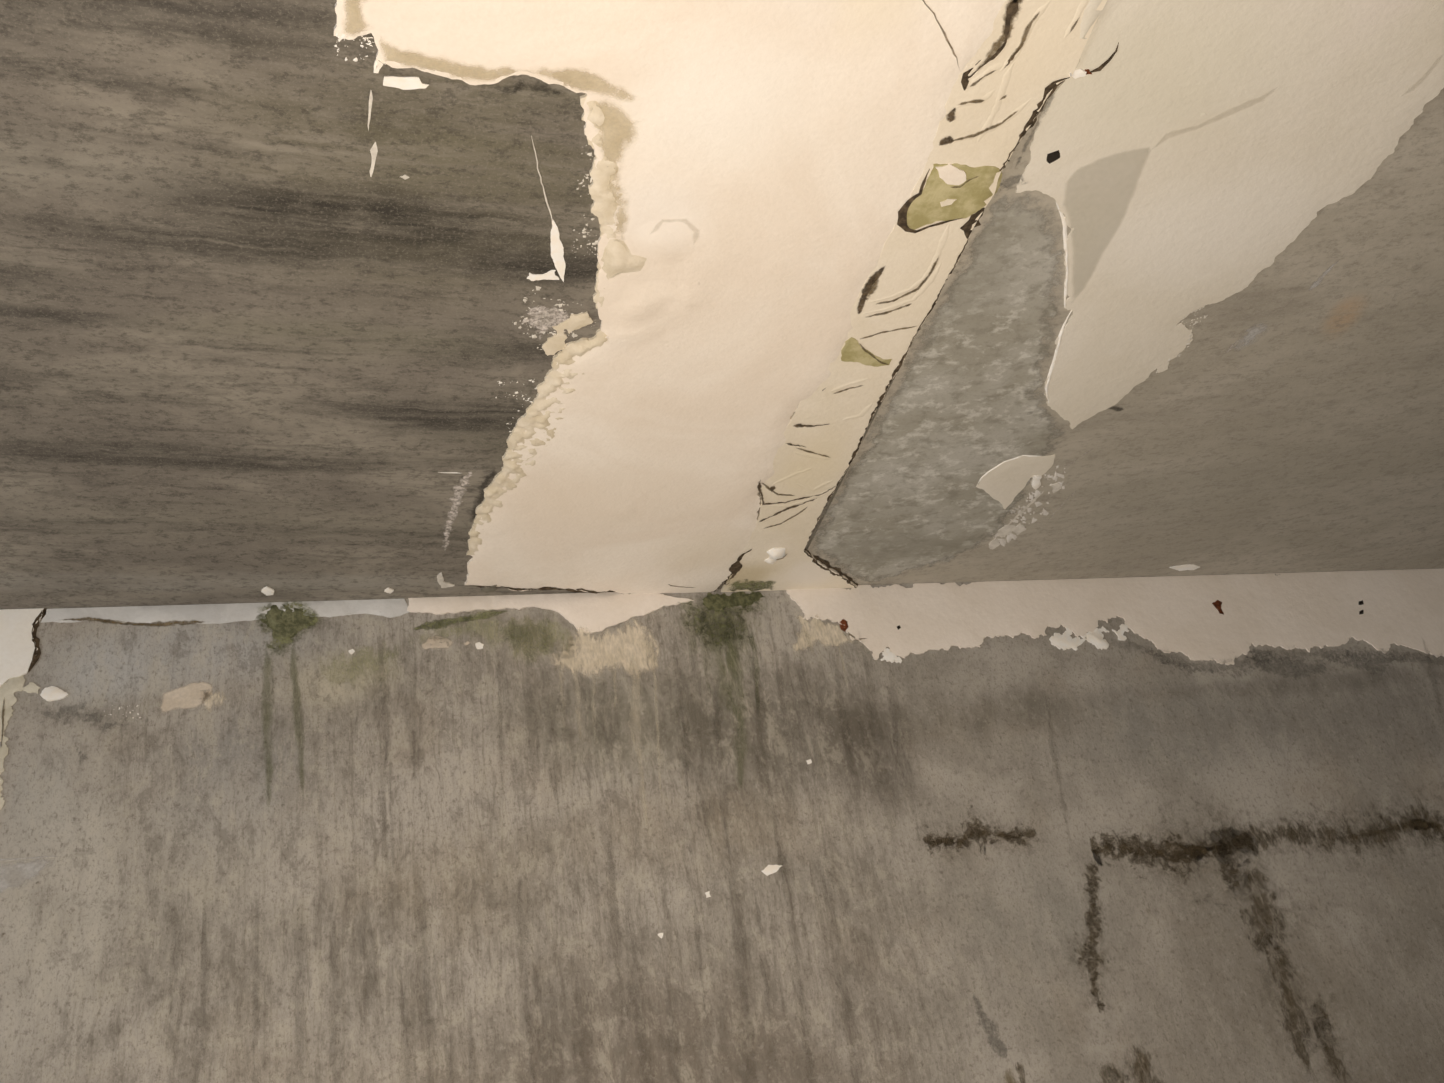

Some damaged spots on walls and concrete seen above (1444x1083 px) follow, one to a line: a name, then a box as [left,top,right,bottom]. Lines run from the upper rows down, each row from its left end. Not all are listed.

flaking render [334,0,1444,665]
crack [670,0,1119,592]
flaking render [0,608,68,810]
water stain [553,620,659,675]
water stain [793,616,852,651]
mould [923,806,1036,851]
water stain [1079,807,1444,1075]